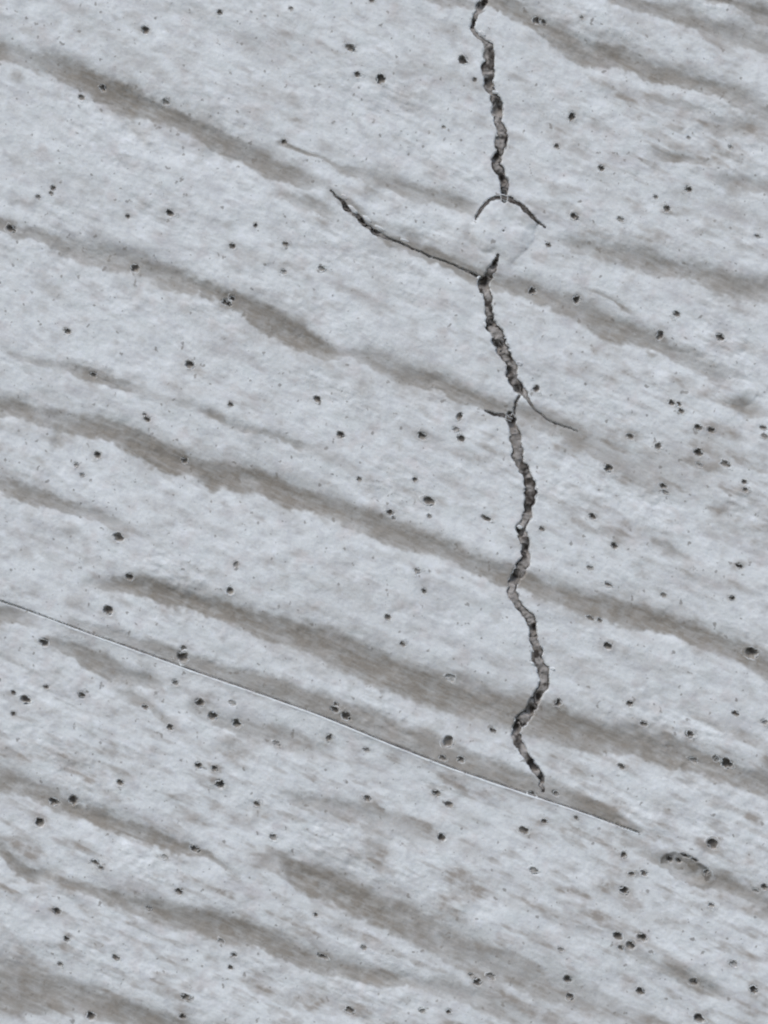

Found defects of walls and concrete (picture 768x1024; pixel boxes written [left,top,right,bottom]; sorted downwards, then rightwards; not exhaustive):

crack [469,0,546,228]
crack [2,191,637,832]